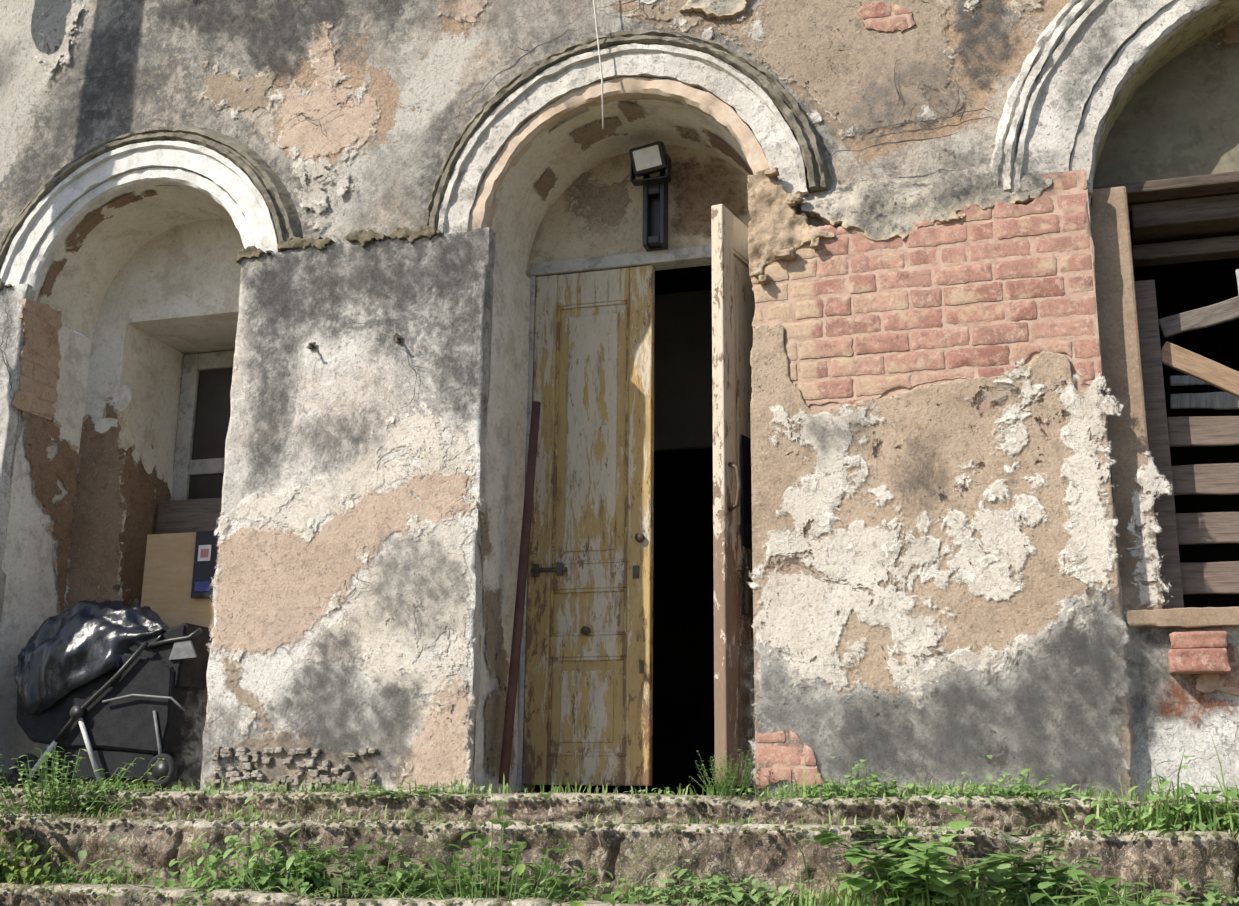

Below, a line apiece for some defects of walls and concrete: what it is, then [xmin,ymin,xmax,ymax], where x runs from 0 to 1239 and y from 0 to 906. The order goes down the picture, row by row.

water stain [152,0,342,77]
peeling [267,88,312,110]
flaking render [11,191,158,440]
peeling [94,385,158,474]
water stain [240,225,485,474]
peeling [675,128,1172,799]
spalling [204,711,379,792]
peeling [214,401,515,777]
water stain [761,598,1171,792]
flaking render [1196,643,1239,697]